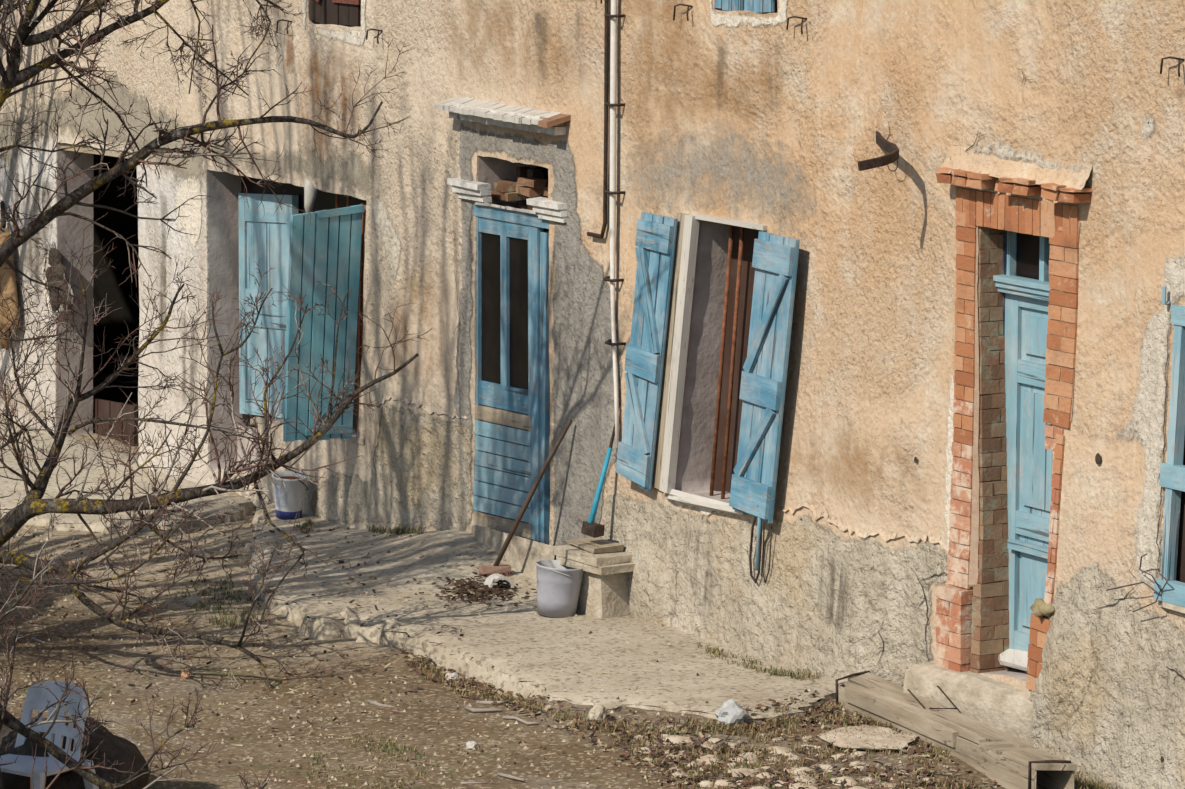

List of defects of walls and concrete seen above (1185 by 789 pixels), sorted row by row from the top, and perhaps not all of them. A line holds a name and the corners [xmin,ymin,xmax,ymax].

flaking render [311,393,473,531]
flaking render [599,375,959,687]
crack [1094,326,1170,611]
flaking render [1029,561,1185,789]